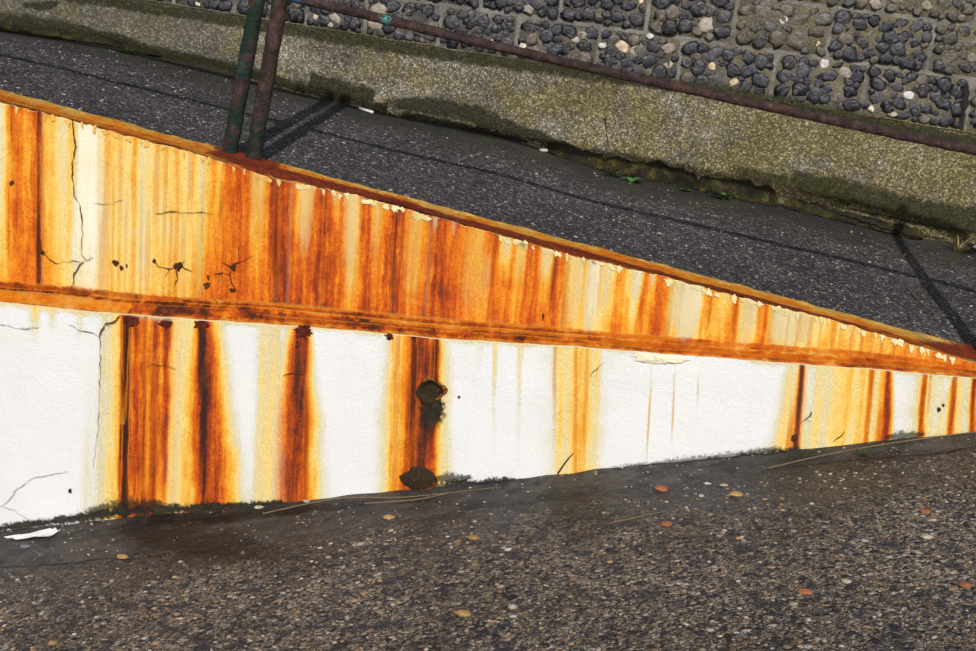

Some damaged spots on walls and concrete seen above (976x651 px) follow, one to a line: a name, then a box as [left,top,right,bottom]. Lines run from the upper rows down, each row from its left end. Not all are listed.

crack [39,120,120,290]
rust [0,91,976,520]
peeling [664,279,956,365]
crack [4,471,66,521]
spalling [399,466,438,491]